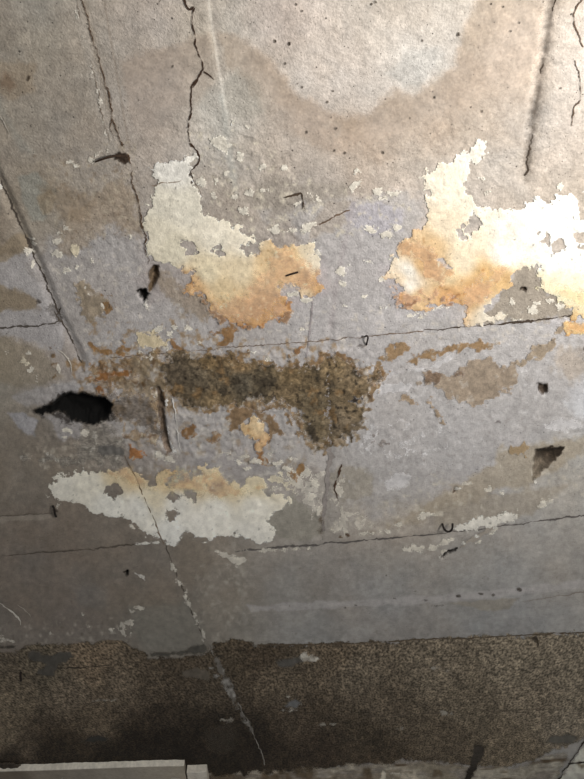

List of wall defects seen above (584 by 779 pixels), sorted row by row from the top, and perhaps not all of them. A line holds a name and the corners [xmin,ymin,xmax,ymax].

crack [81,0,213,263]
damp [220,0,542,136]
crack [571,0,584,126]
peeling [137,153,325,330]
rust [201,299,262,346]
damp [38,343,446,470]
crack [196,315,571,351]
rust [390,239,454,310]
damp [407,352,455,372]
peeling [363,138,584,336]
peeling [45,386,402,568]
spalling [0,605,584,779]